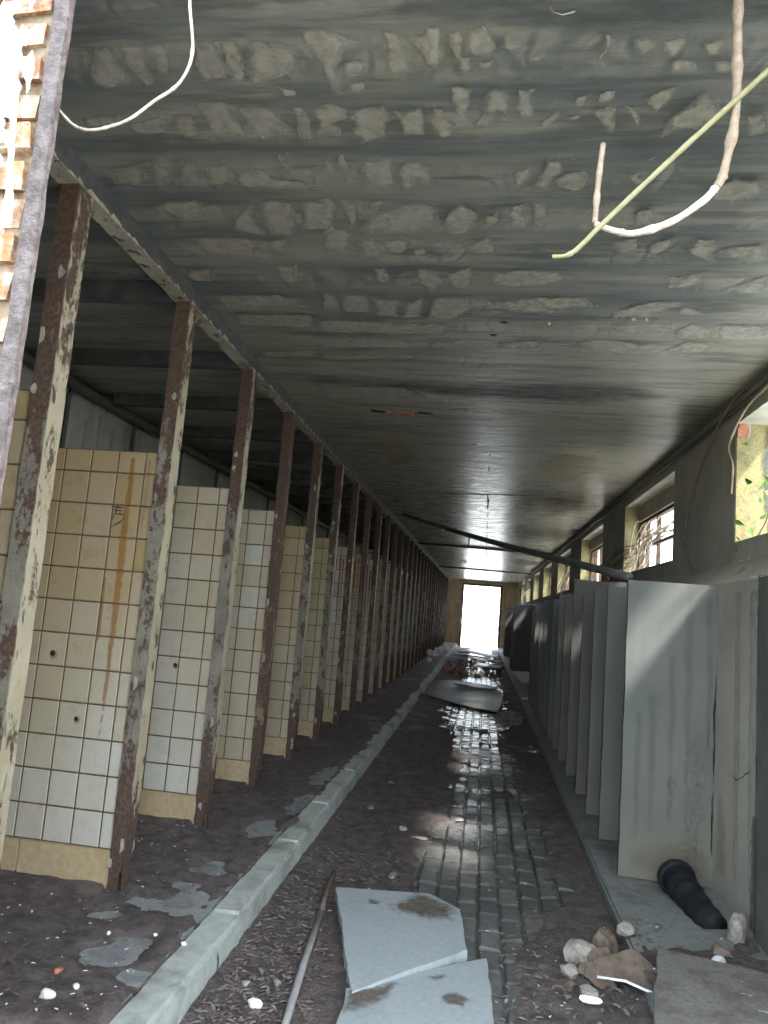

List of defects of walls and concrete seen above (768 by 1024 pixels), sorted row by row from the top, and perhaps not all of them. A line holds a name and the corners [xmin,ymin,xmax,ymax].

peeling [384,27,519,72]
peeling [129,29,470,141]
peeling [663,95,719,134]
peeling [59,167,236,351]
peeling [196,199,550,256]
peeling [515,158,586,190]
peeling [636,210,653,226]
peeling [689,240,764,262]
peeling [712,180,763,202]
peeling [217,268,473,348]
peeling [488,296,766,354]
rust [98,459,134,707]